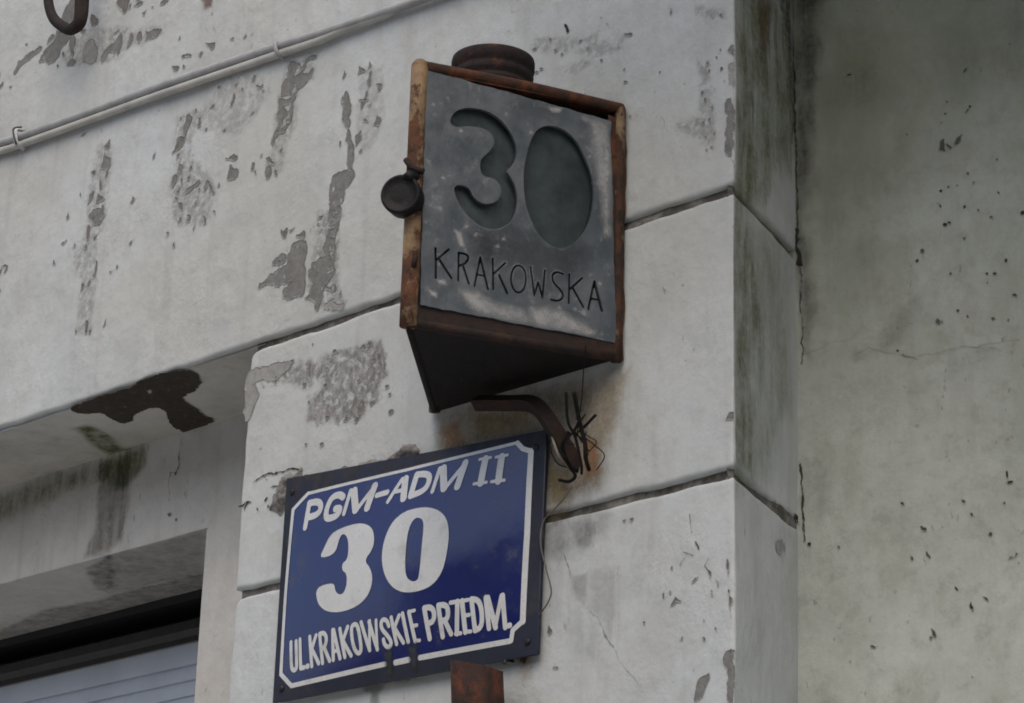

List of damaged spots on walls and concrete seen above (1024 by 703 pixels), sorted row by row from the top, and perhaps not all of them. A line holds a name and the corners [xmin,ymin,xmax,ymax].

peeling [0,0,168,89]
damp [738,0,816,199]
peeling [61,139,111,249]
peeling [166,54,317,247]
peeling [257,61,382,311]
crack [794,69,804,364]
peeling [70,370,215,433]
peeling [243,359,294,421]
damp [80,427,140,486]
crack [798,464,806,543]
peeling [693,673,710,702]
spalling [722,649,736,703]